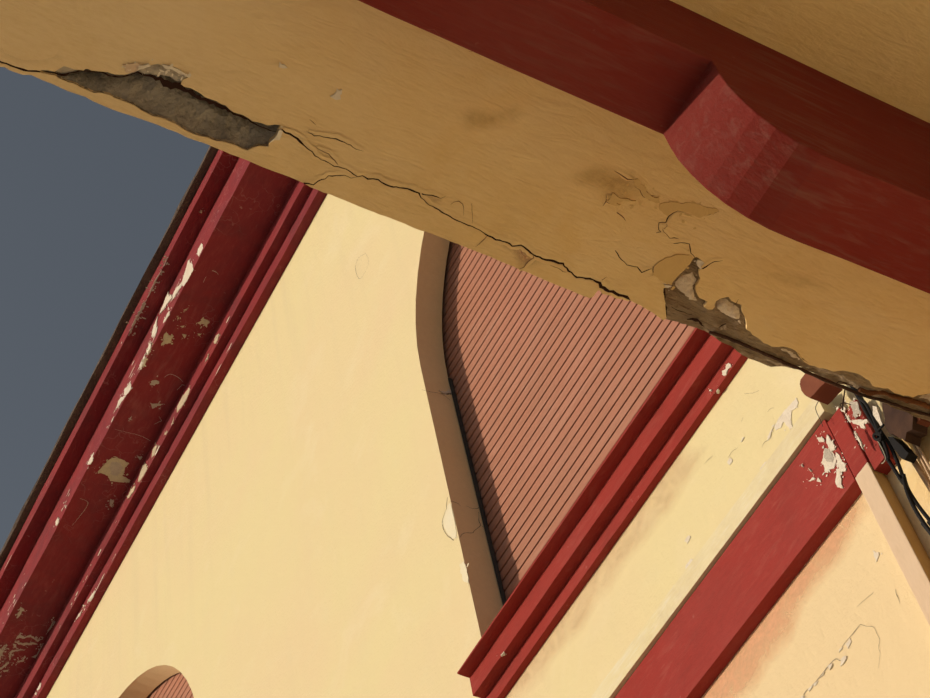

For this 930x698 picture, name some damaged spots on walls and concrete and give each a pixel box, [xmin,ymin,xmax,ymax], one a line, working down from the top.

crack [0,55,41,75]
spalling [41,59,283,150]
crack [282,117,655,301]
peeling [107,244,210,435]
spalling [653,250,930,452]
peeling [86,443,159,498]
peeling [0,617,61,677]